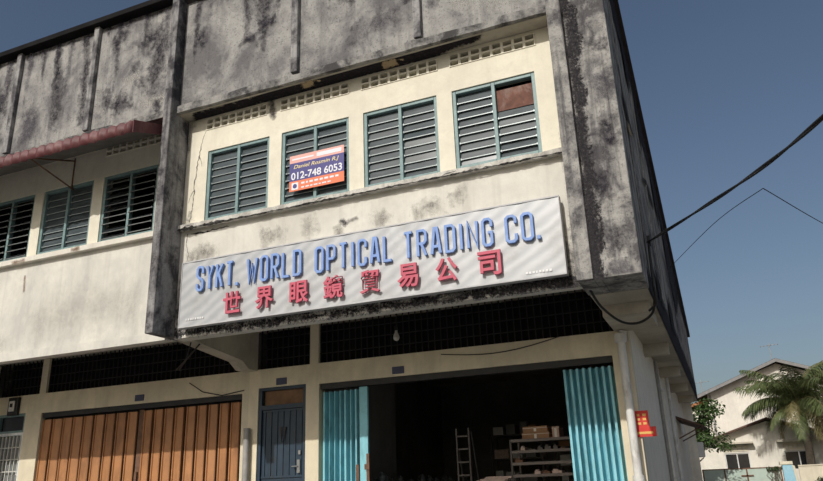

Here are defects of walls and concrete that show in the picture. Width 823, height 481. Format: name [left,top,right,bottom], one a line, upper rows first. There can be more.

water stain [21,112,37,143]
water stain [28,34,90,125]
water stain [103,92,131,112]
water stain [106,7,170,89]
crack [177,132,562,258]
water stain [169,0,632,340]
water stain [610,0,698,400]